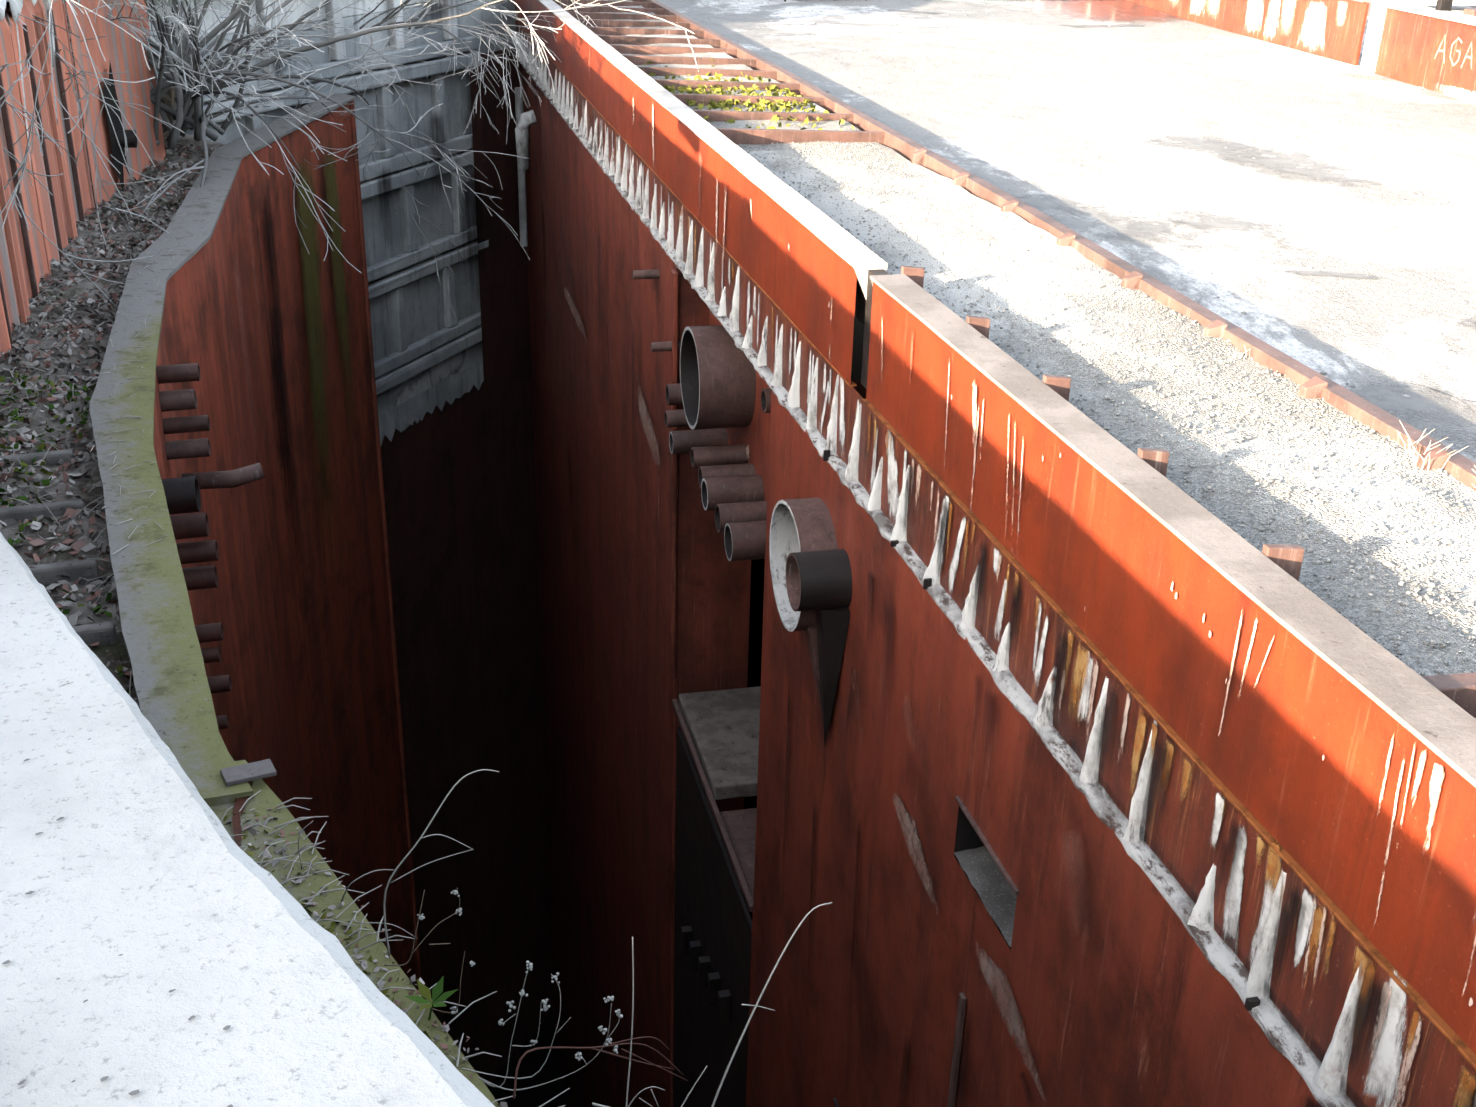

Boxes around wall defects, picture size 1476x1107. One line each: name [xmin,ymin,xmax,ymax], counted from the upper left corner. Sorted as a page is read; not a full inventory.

rust [868,416,975,567]
rust [993,549,1019,611]
rust [1033,597,1042,671]
water stain [1218,611,1274,735]
rust [1118,693,1192,797]
rust [1212,792,1225,845]
water stain [1375,735,1445,922]
water stain [1224,826,1336,986]
rust [1294,890,1326,966]
water stain [1311,1046,1324,1064]
water stain [1352,962,1406,1107]
rust [1393,1011,1422,1107]